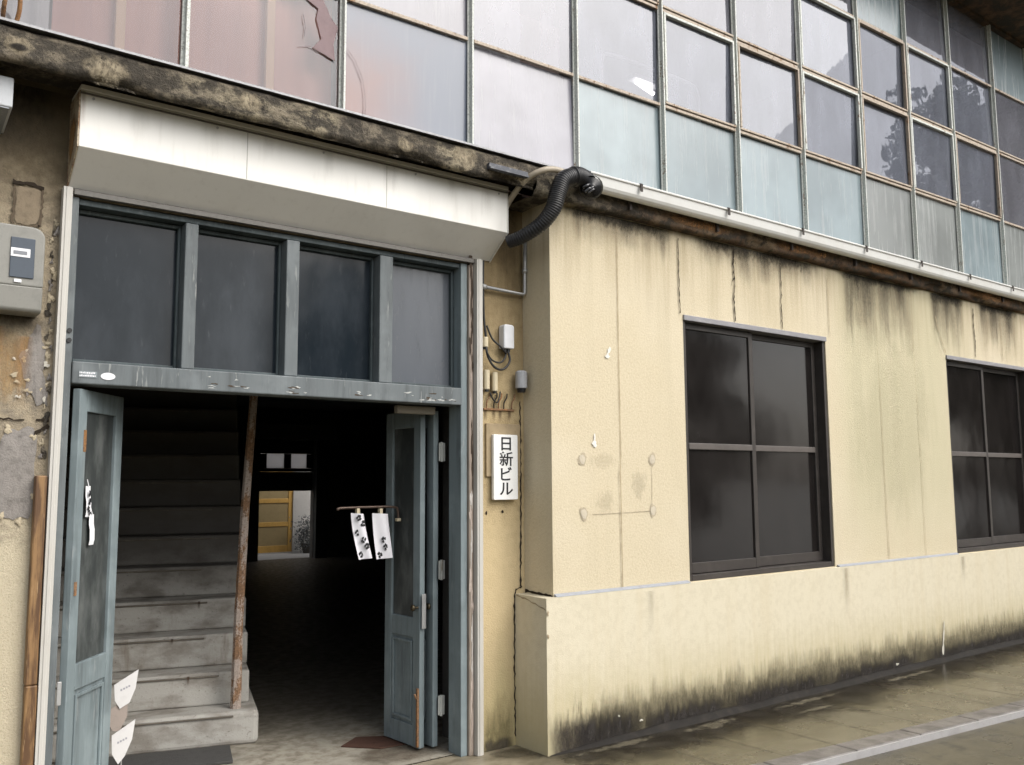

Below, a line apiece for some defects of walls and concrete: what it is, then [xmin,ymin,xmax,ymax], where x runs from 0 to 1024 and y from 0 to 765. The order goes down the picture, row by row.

water stain [706,239,806,267]
water stain [848,273,904,291]
water stain [932,293,959,307]
water stain [981,305,1011,326]
spalling [0,179,60,526]
water stain [537,621,1024,761]